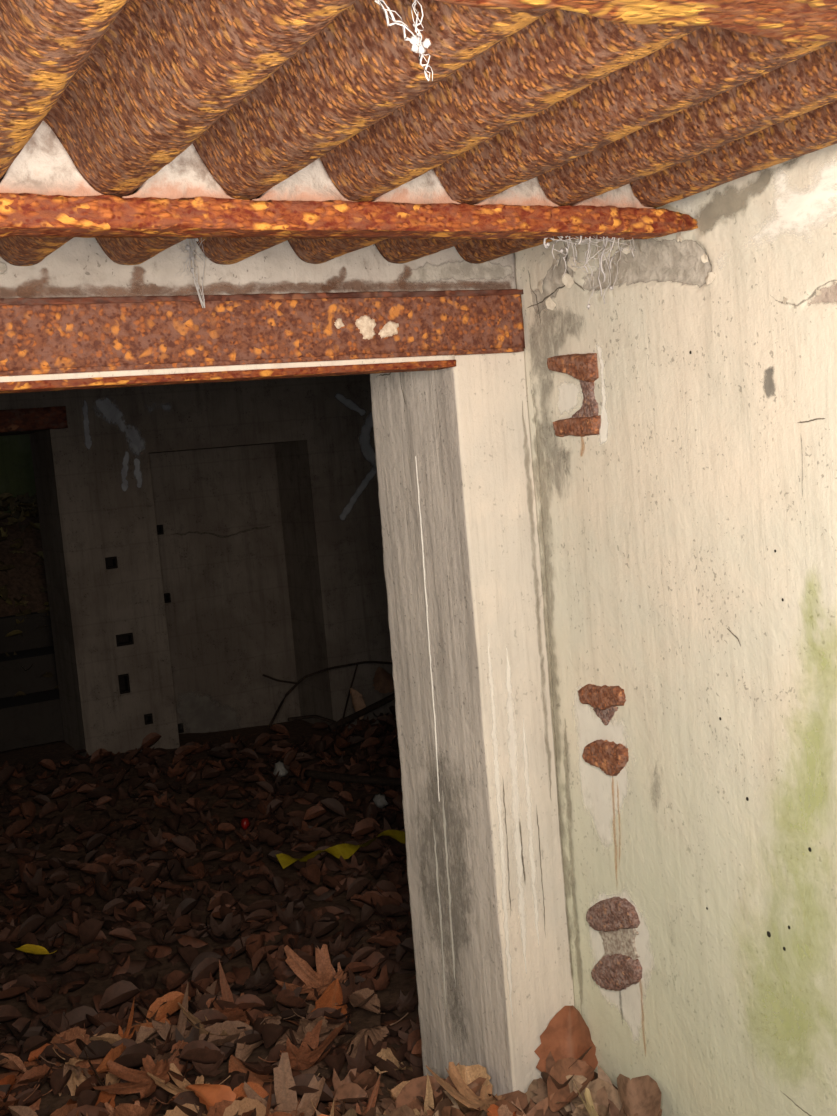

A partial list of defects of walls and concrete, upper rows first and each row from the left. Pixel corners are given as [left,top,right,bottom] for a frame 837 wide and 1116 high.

spalling [402,260,512,283]
spalling [528,232,716,323]
spalling [781,282,837,306]
damp [415,456,456,1016]